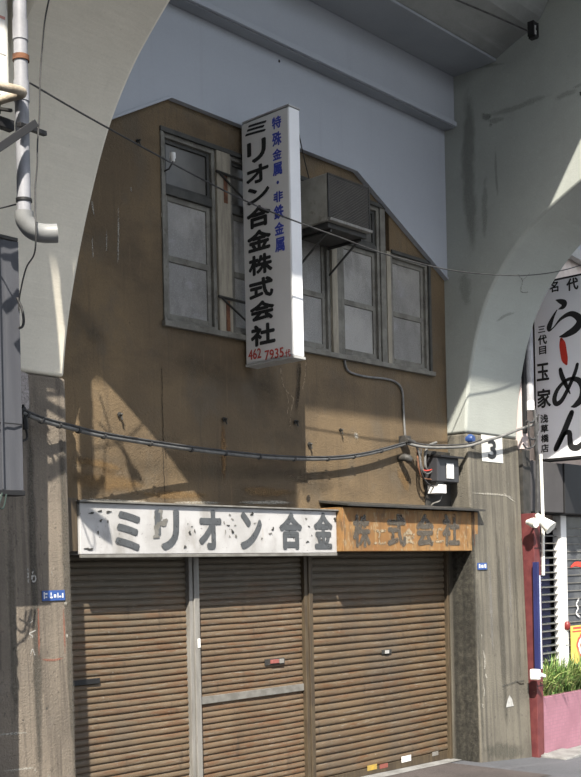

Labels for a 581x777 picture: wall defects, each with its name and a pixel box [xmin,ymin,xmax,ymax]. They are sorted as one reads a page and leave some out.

damp [29,448,41,753]